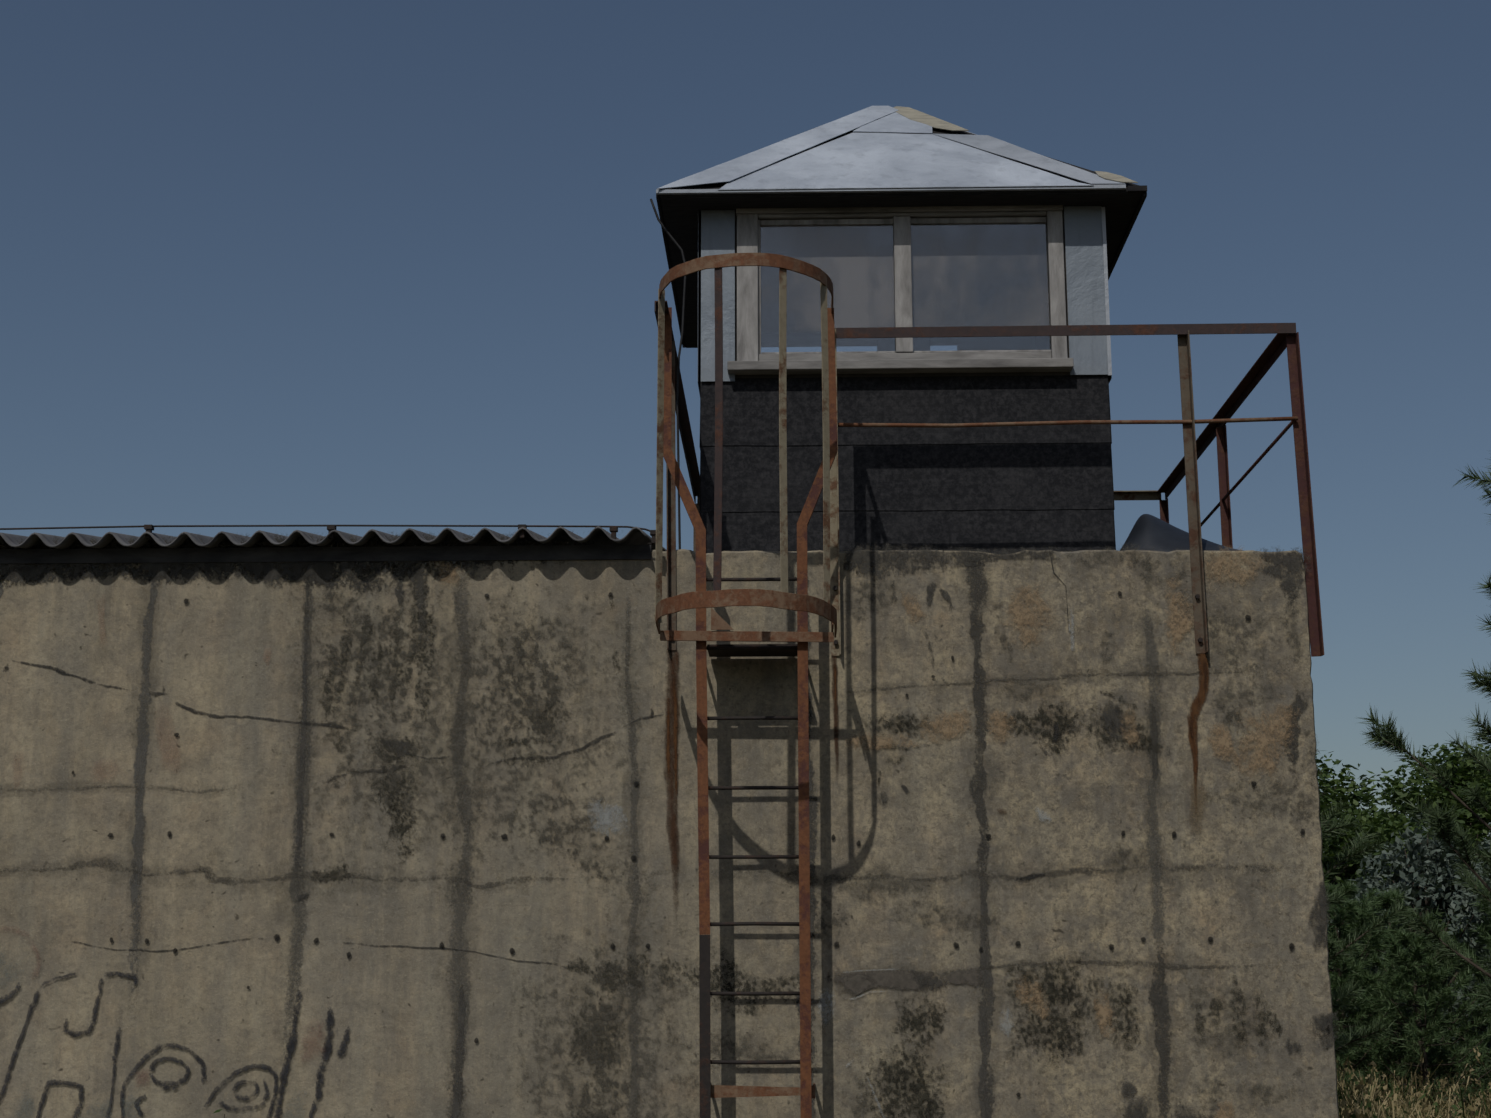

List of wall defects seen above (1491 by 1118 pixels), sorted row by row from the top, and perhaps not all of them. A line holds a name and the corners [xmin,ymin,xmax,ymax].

water stain [0,534,584,771]
crack [4,661,447,781]
water stain [367,735,419,862]
crack [497,709,661,763]
corrosion [665,652,679,884]
water stain [1004,683,1170,755]
corrosion [1187,653,1209,804]
crack [74,938,248,952]
crack [347,942,568,967]
water stain [568,953,800,1118]
water stain [852,995,946,1118]
water stain [1007,958,1140,1062]